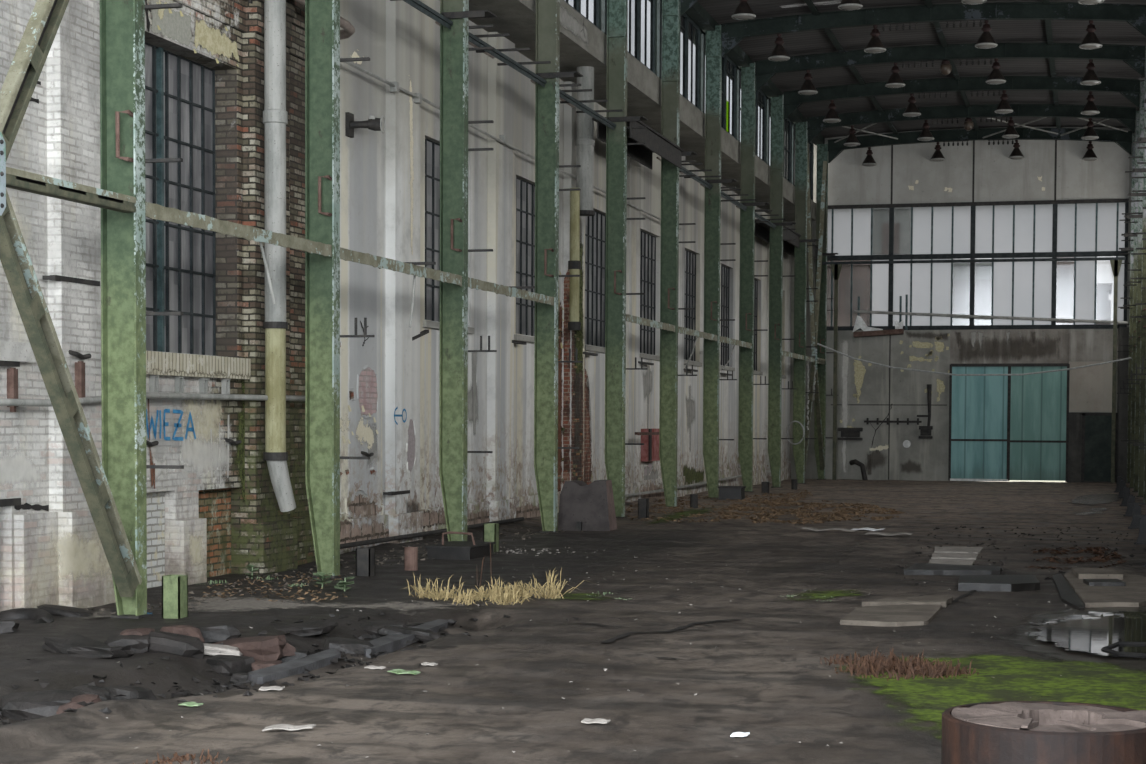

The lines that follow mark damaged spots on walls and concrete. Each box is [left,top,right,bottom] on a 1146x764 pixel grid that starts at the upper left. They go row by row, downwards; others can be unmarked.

peeling [150,0,239,66]
flaking render [340,364,379,450]
flaking render [558,270,593,491]
peeling [900,334,950,401]
flaking render [406,419,416,473]
flaking render [340,489,389,550]